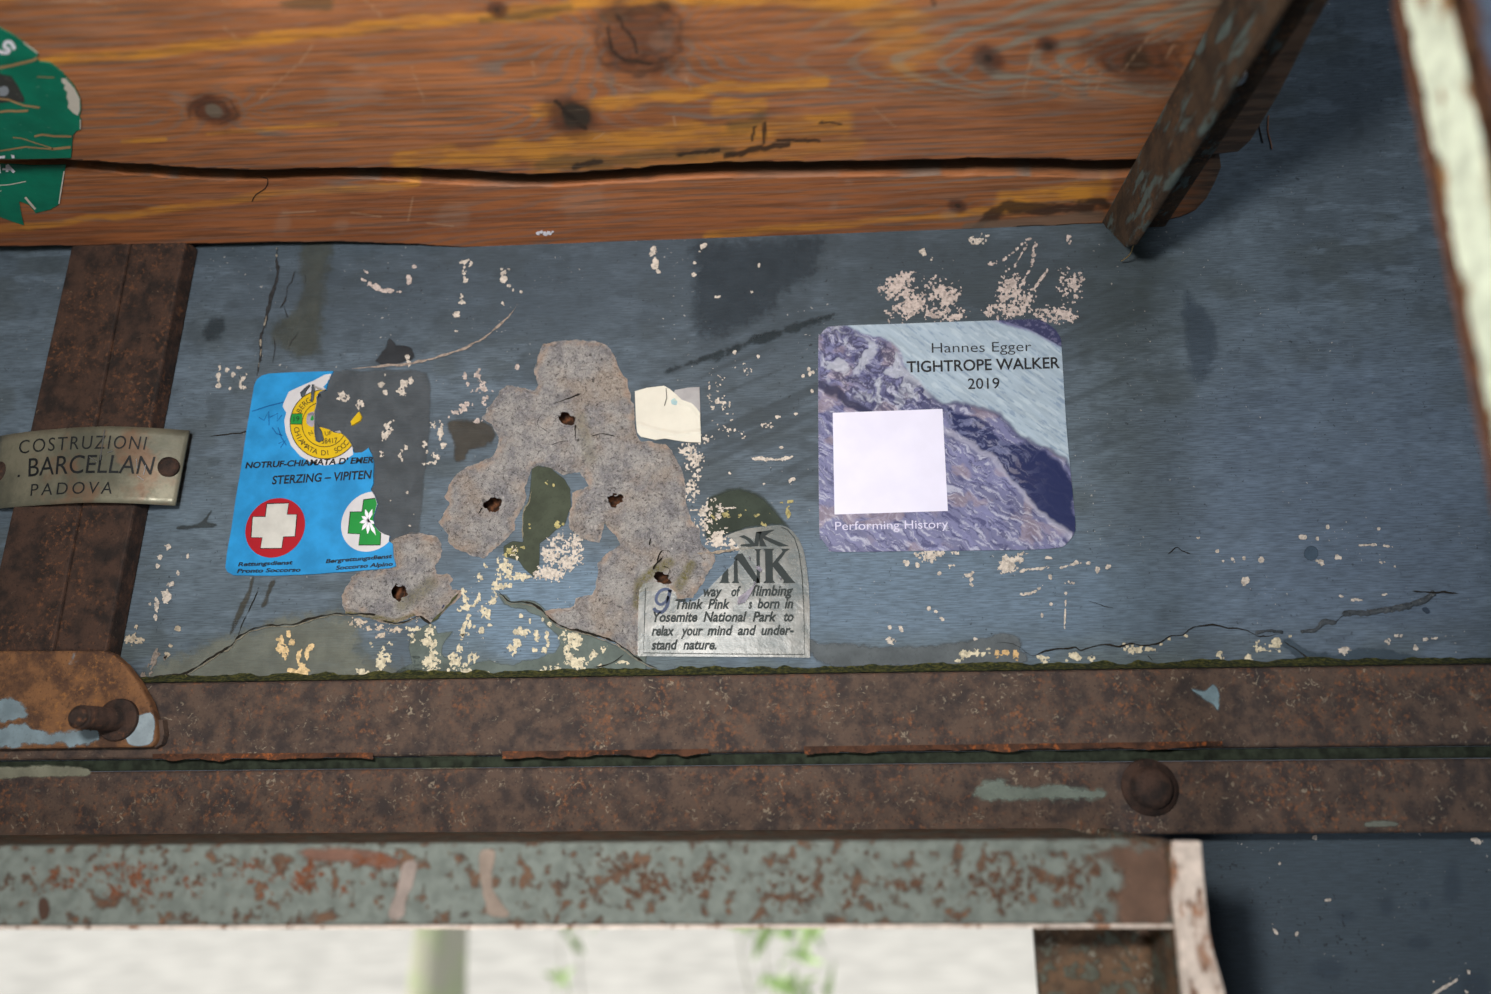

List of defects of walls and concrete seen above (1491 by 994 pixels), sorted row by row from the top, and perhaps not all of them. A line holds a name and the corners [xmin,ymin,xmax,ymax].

peeling [649,246,661,273]
peeling [877,238,1085,325]
peeling [336,391,364,410]
spalling [342,340,796,675]
peeling [1215,549,1264,589]
peeling [1122,634,1188,655]
peeling [1244,635,1292,660]
corrosion [31,848,417,920]
corrosion [479,849,509,917]
corrosion [576,841,1172,932]